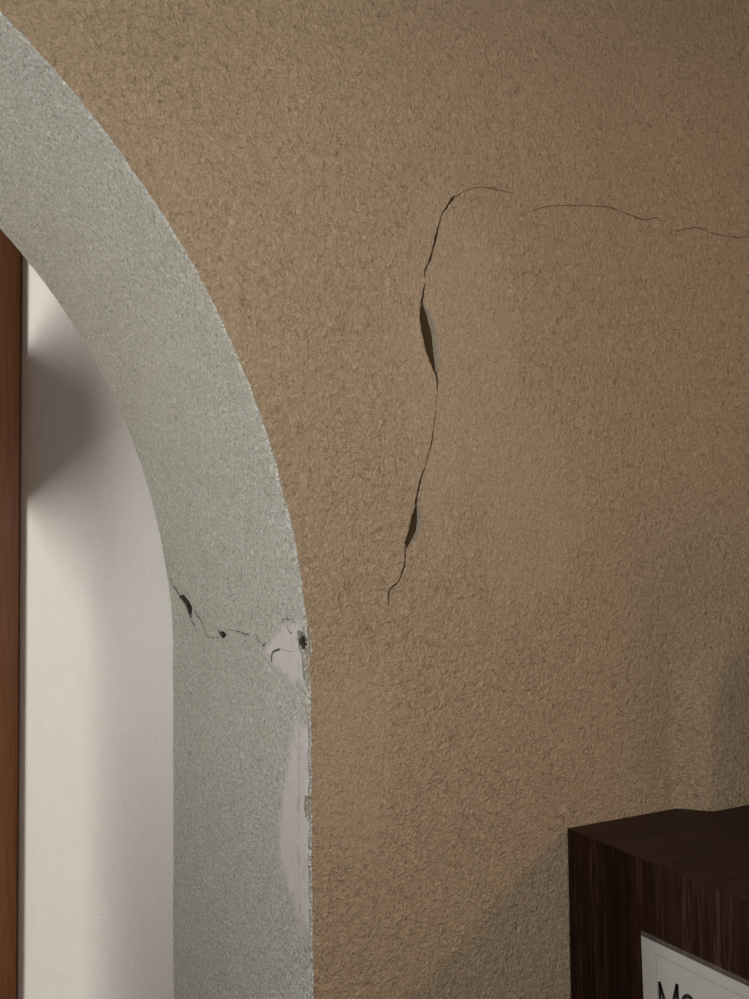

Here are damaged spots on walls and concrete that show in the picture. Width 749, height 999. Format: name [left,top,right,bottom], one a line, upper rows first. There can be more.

crack [388,187,749,605]
crack [170,579,300,662]
flaking render [298,627,313,687]